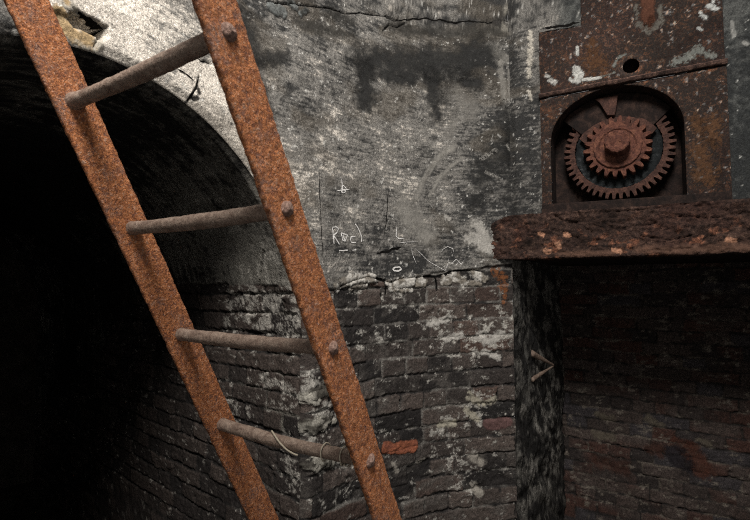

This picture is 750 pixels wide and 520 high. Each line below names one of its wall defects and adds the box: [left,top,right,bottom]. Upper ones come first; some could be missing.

spalling [52,0,104,53]
crack [274,3,508,29]
water stain [356,61,376,113]
water stain [423,67,484,136]
crack [375,270,480,294]
efflorescence [426,315,452,327]
efflorescence [443,331,464,342]
efflorescence [474,331,506,360]
efflorescence [464,391,496,422]
efflorescence [468,454,484,467]
efflorescence [470,482,484,498]